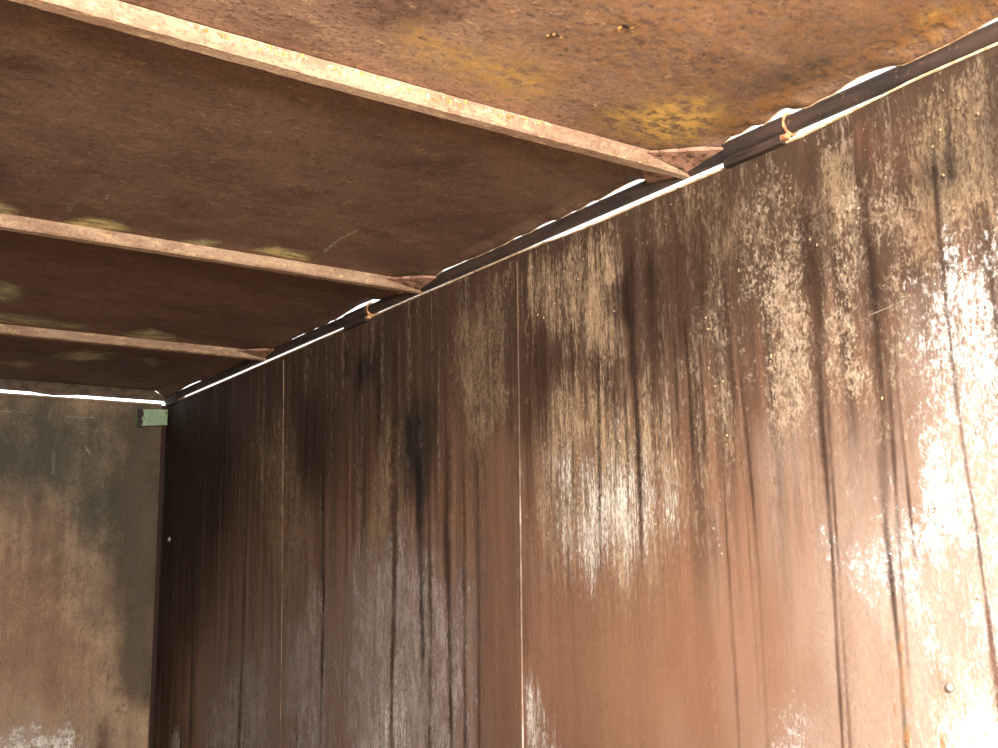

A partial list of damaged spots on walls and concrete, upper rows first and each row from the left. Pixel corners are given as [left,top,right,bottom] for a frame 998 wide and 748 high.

corrosion [608,91,791,144]
corrosion [861,0,998,59]
water stain [0,396,453,748]
water stain [607,255,643,544]
water stain [806,176,998,748]